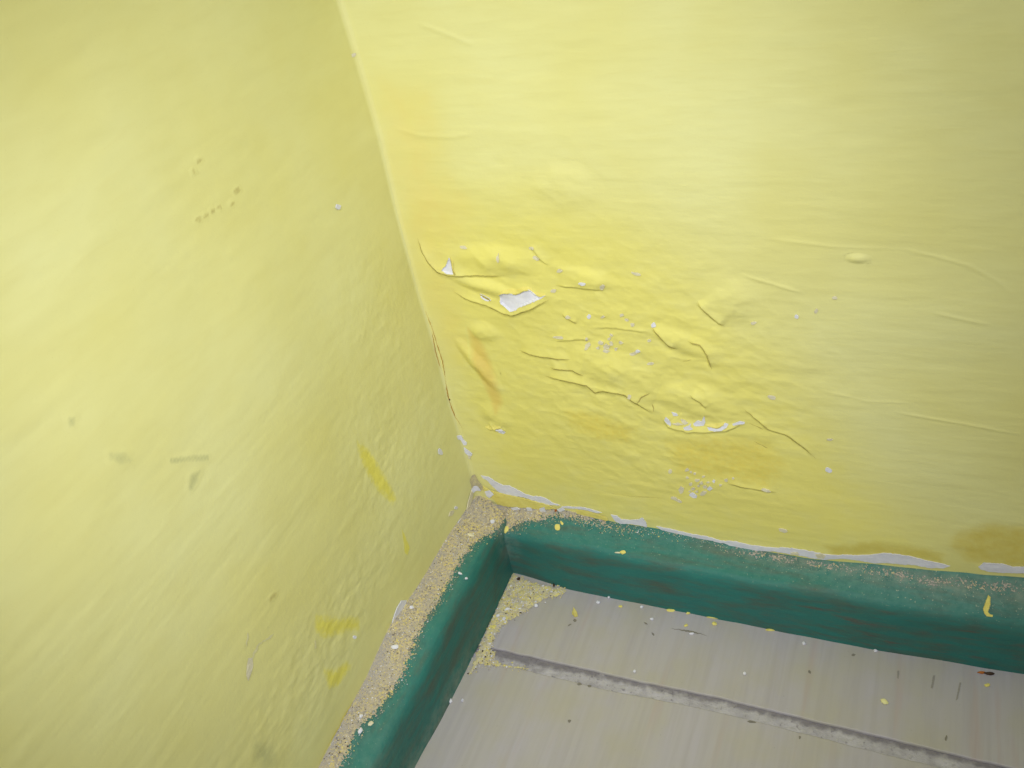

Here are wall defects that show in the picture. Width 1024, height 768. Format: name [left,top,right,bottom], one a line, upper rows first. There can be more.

peeling [441,258,456,275]
peeling [480,286,556,312]
damp [356,48,1024,577]
peeling [584,322,656,356]
crack [653,329,712,369]
crack [520,350,654,412]
peeling [664,412,745,432]
crack [747,412,815,458]
peeling [671,468,735,503]
peeling [319,474,1024,768]